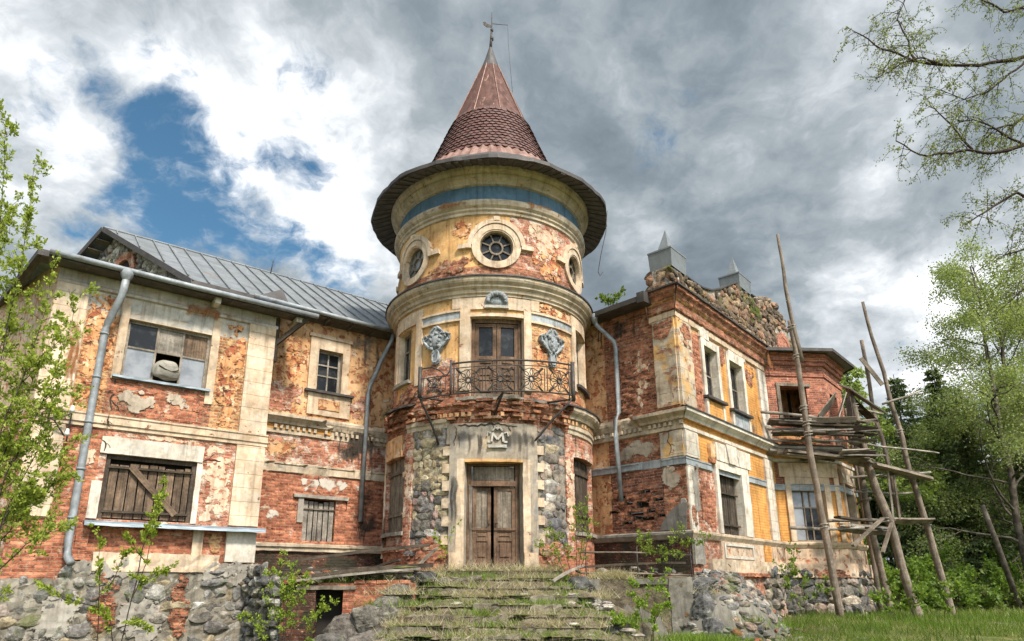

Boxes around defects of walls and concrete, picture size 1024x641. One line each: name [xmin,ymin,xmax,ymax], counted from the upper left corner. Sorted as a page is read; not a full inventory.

flaking render [428,256,481,275]
flaking render [451,220,472,239]
flaking render [528,224,562,284]
flaking render [77,294,246,427]
flaking render [269,339,305,411]
flaking render [610,355,653,417]
flaking render [652,316,704,406]
peeling [126,433,233,553]
flaking render [601,482,665,534]
flaking render [681,473,716,532]